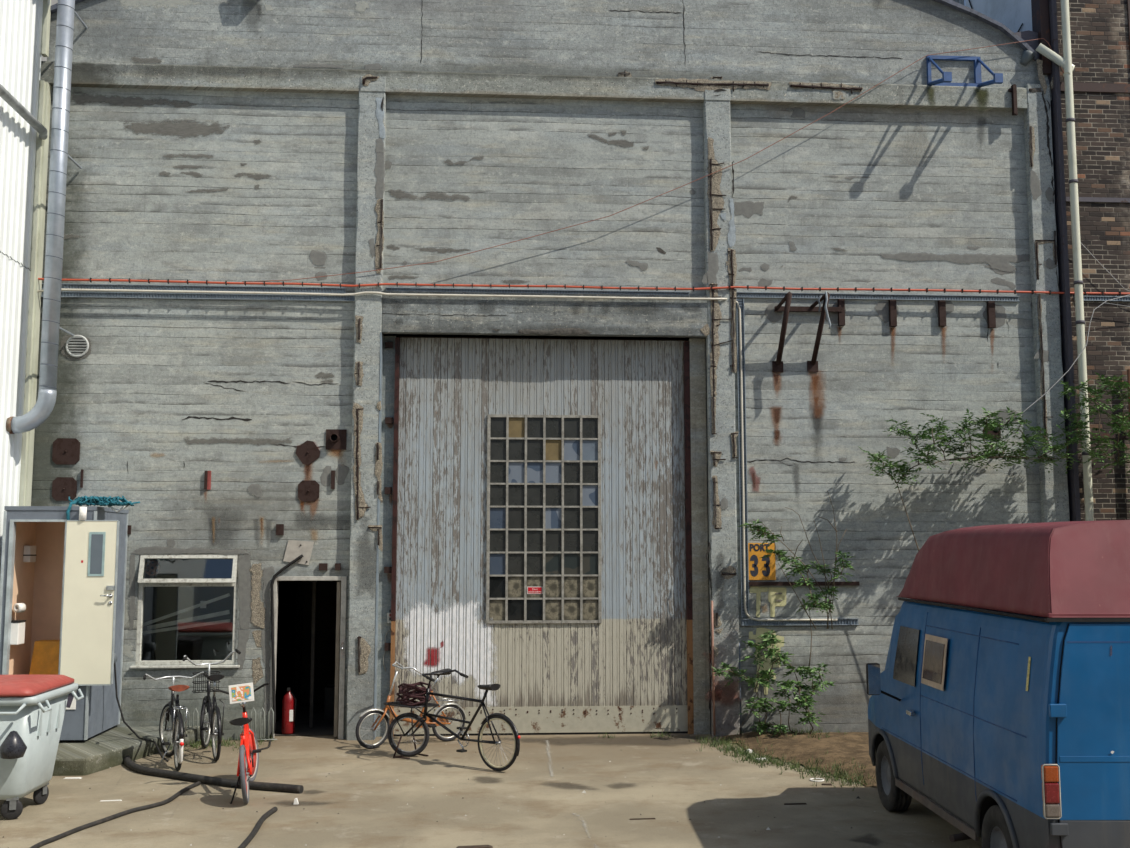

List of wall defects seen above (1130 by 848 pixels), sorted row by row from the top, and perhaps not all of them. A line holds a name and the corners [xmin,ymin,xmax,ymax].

crack [609,3,686,61]
crack [182,380,339,421]